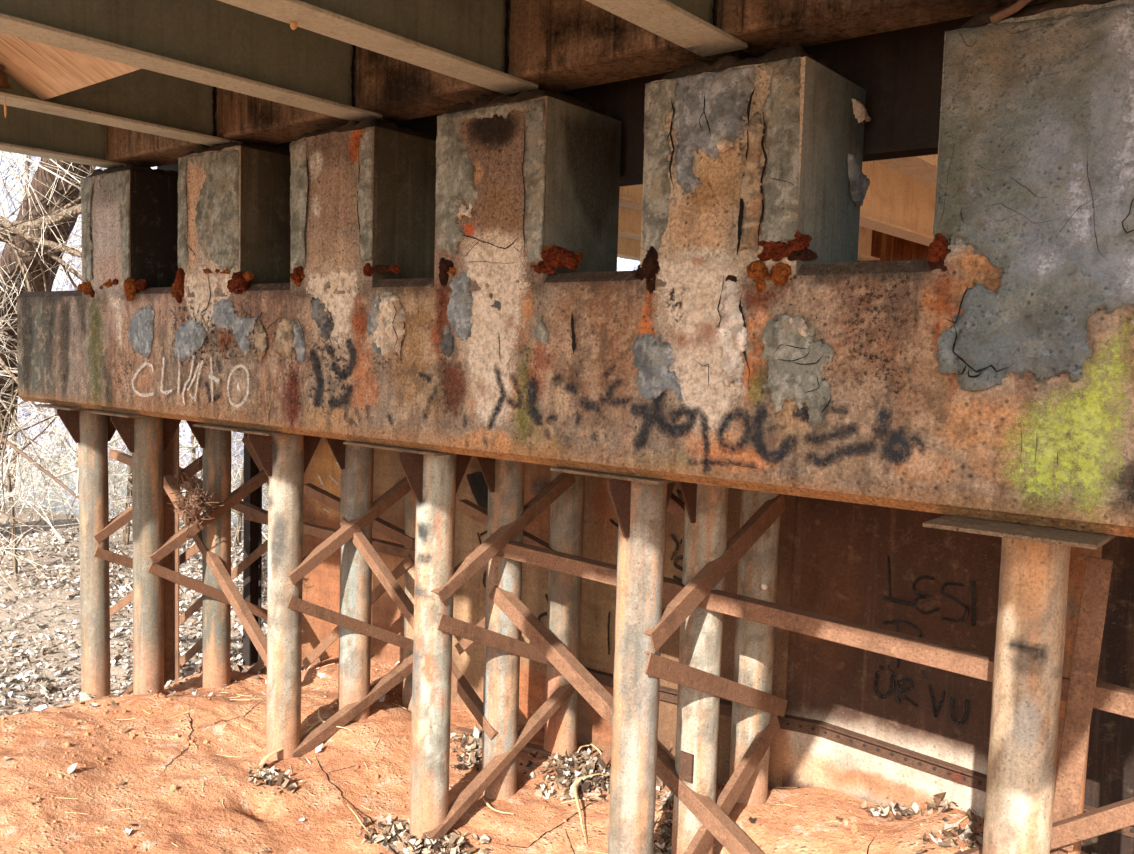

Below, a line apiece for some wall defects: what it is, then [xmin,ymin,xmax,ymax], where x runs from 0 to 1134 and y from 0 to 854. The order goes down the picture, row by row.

peeling [642,56,801,254]
peeling [933,3,1134,392]
peeling [173,297,349,413]
spalling [439,272,473,413]
spalling [632,333,683,401]
spalling [716,275,911,433]